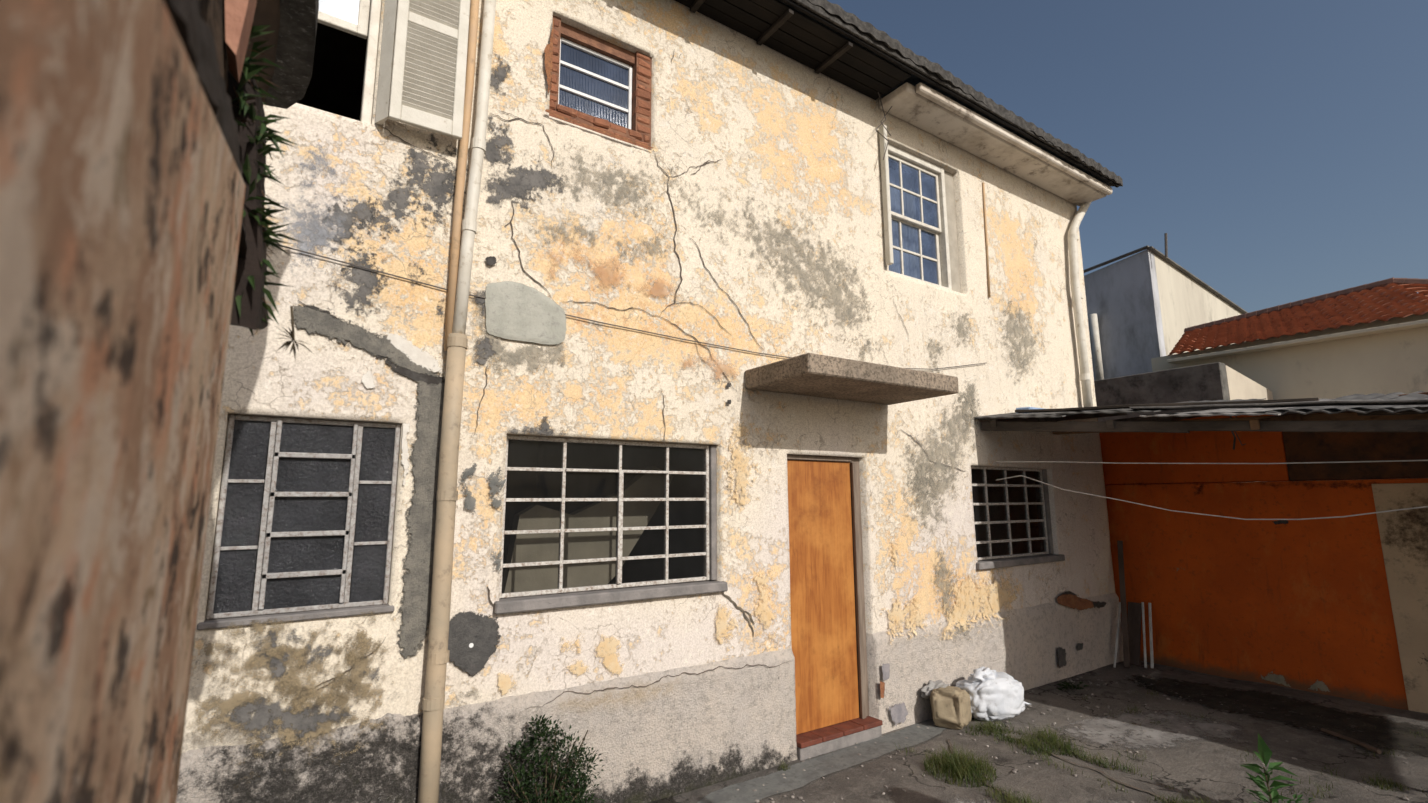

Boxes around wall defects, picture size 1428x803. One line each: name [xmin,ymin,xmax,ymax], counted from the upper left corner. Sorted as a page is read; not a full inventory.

water stain [490,54,513,94]
crack [490,109,554,167]
spalling [544,18,655,149]
water stain [285,116,877,361]
crack [504,152,763,389]
water stain [928,314,971,373]
water stain [997,301,1039,383]
peeling [899,381,979,533]
water stain [193,612,394,773]
peeling [560,633,624,679]
crack [525,593,789,710]
peeling [881,552,1017,645]